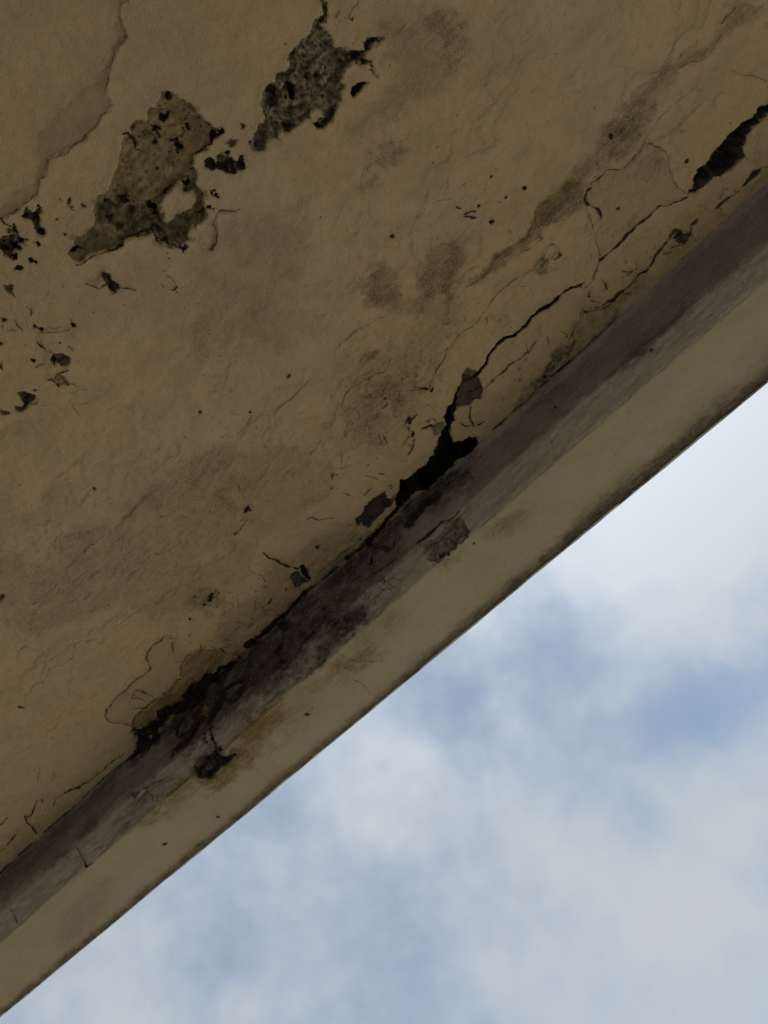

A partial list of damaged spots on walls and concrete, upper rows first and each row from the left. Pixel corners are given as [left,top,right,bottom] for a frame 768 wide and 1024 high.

spalling [0,111,111,270]
spalling [59,0,383,266]
spalling [685,104,768,192]
spalling [715,166,768,210]
crack [0,137,767,874]
water stain [0,196,768,901]
spalling [315,368,485,583]
spalling [194,747,238,780]